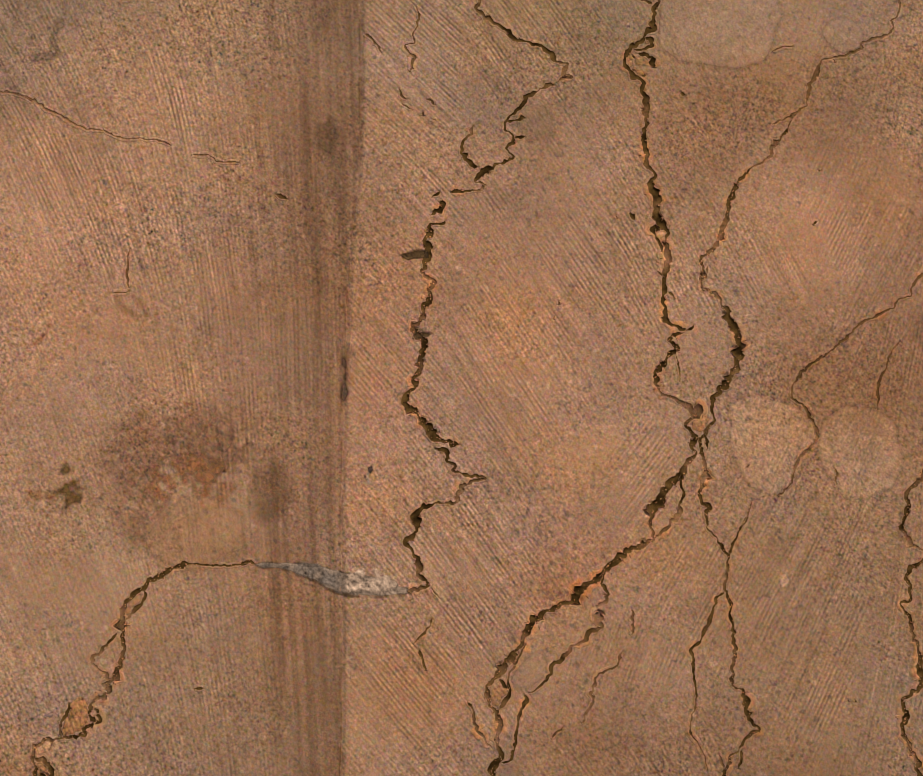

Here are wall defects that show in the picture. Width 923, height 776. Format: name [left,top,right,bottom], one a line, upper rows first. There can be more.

crack [0,88,171,147]
crack [192,151,239,165]
crack [363,5,436,123]
crack [113,249,133,297]
crack [397,0,575,670]
crack [465,0,923,776]
water stain [148,493,244,569]
crack [27,558,256,776]